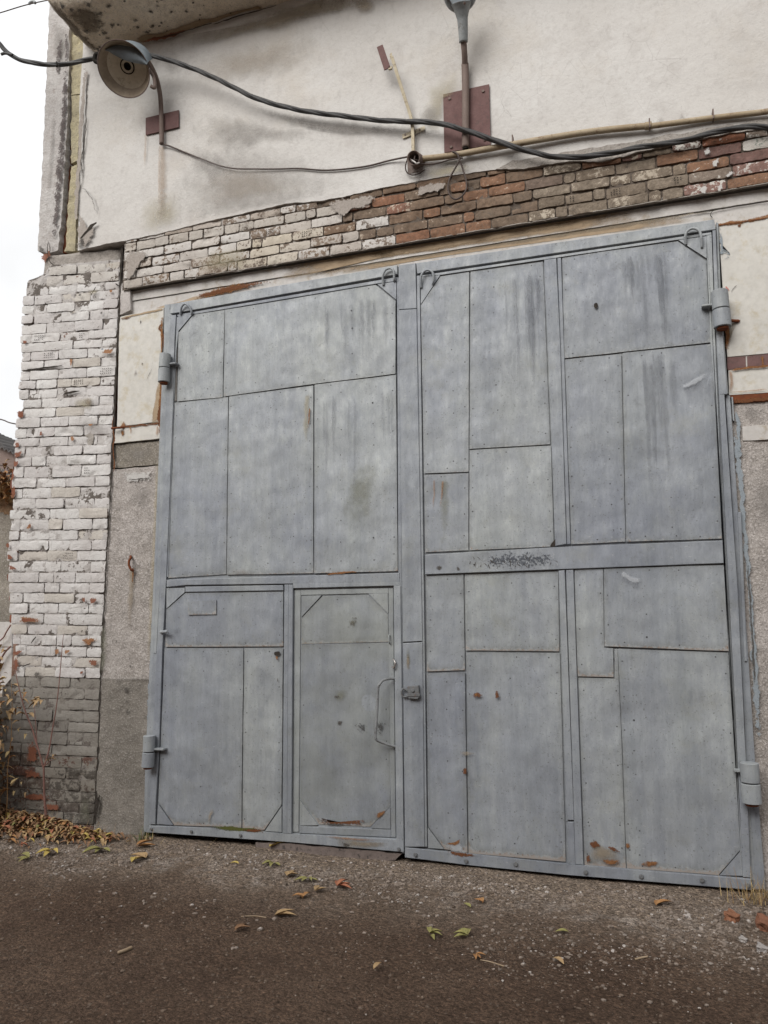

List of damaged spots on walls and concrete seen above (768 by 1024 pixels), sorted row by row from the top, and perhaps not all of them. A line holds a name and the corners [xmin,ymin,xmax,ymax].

flaking render [74,69,97,249]
peeling [418,183,446,196]
spalling [0,442,21,515]
rust [586,841,630,865]